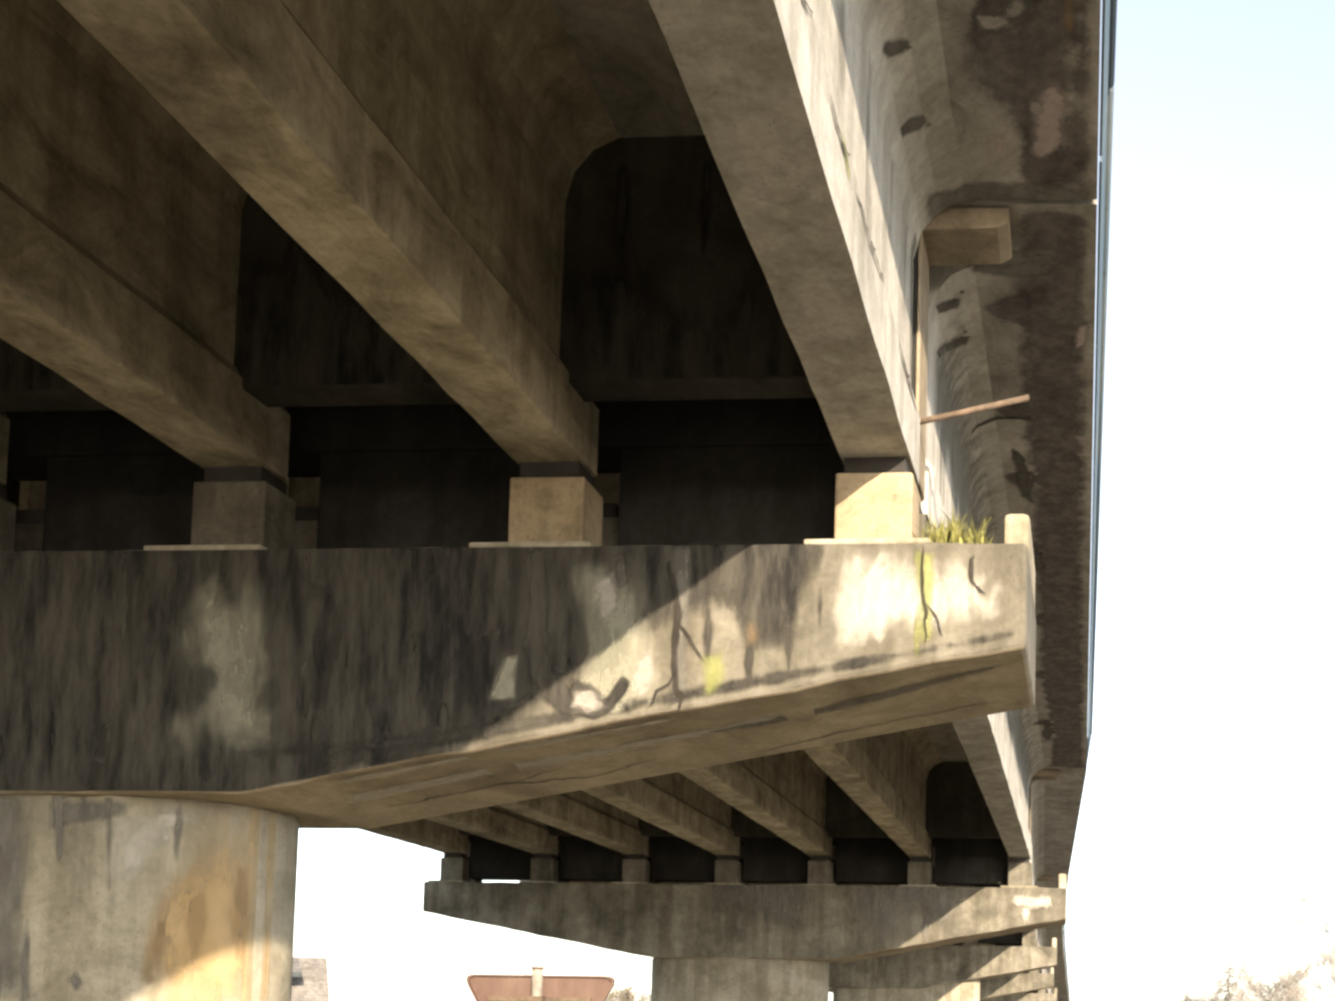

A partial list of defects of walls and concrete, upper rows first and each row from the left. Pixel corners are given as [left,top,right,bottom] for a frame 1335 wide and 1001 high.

spalling [883,40,911,57]
spalling [901,115,930,137]
water stain [927,0,1090,801]
crack [649,562,703,709]
water stain [840,558,992,653]
water stain [814,667,993,715]
water stain [0,544,893,1001]
crack [390,758,656,807]
rust [162,825,275,1001]